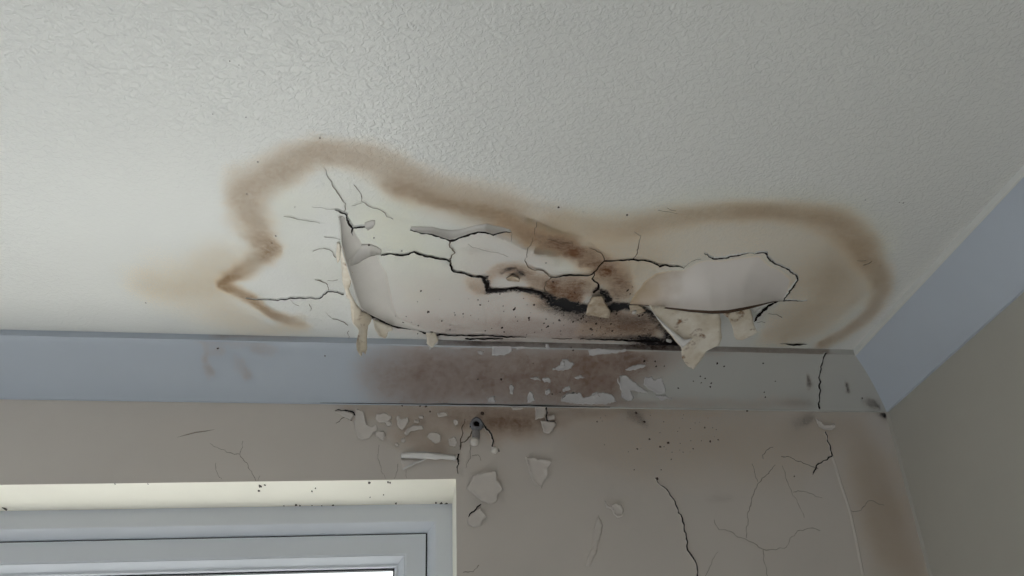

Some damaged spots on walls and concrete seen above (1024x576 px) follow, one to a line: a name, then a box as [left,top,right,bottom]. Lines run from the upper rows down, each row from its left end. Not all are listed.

crack [246,168,807,340]
leakage [110,130,904,465]
peeling [478,346,527,356]
peeling [588,348,626,356]
crack [552,337,678,345]
peeling [509,359,672,434]
peeling [336,409,458,470]
peeling [466,471,503,504]
crack [655,343,833,576]